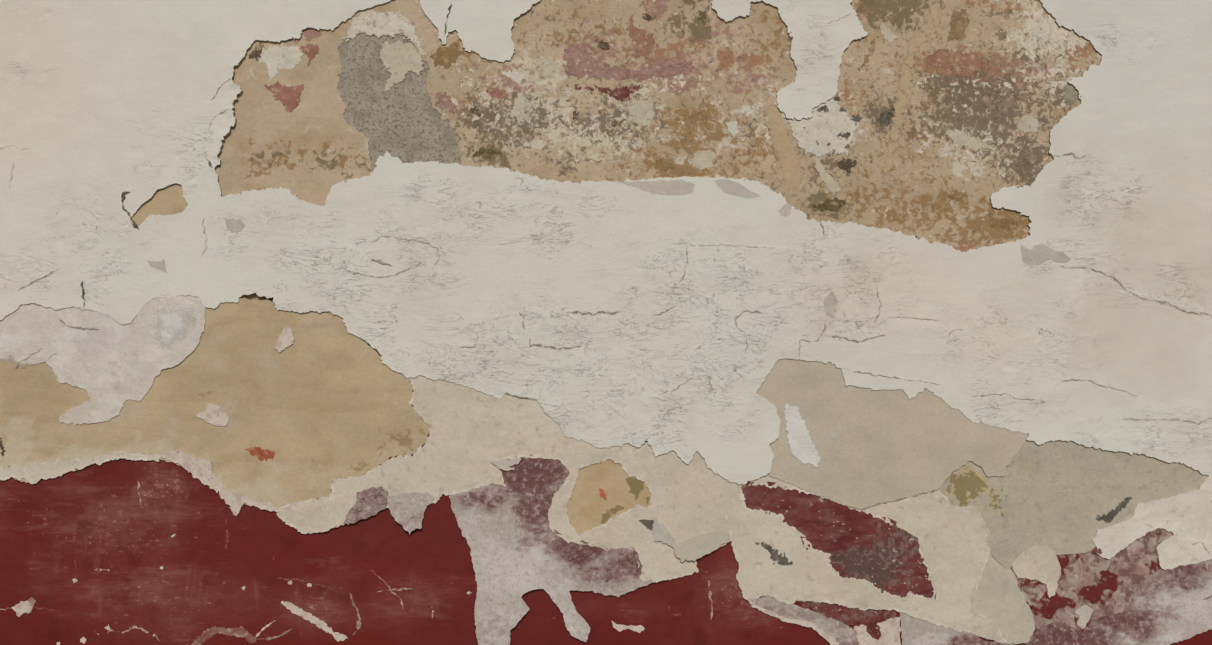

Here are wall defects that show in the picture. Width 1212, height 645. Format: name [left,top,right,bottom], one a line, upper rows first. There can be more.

flaking render [215,0,1101,266]
flaking render [131,184,188,227]
crack [519,312,578,350]
crack [570,309,618,317]
crack [651,243,766,316]
crack [734,310,765,351]
crack [799,291,964,385]
crack [1061,266,1212,316]
crack [971,379,1212,425]
peeling [0,291,1212,645]